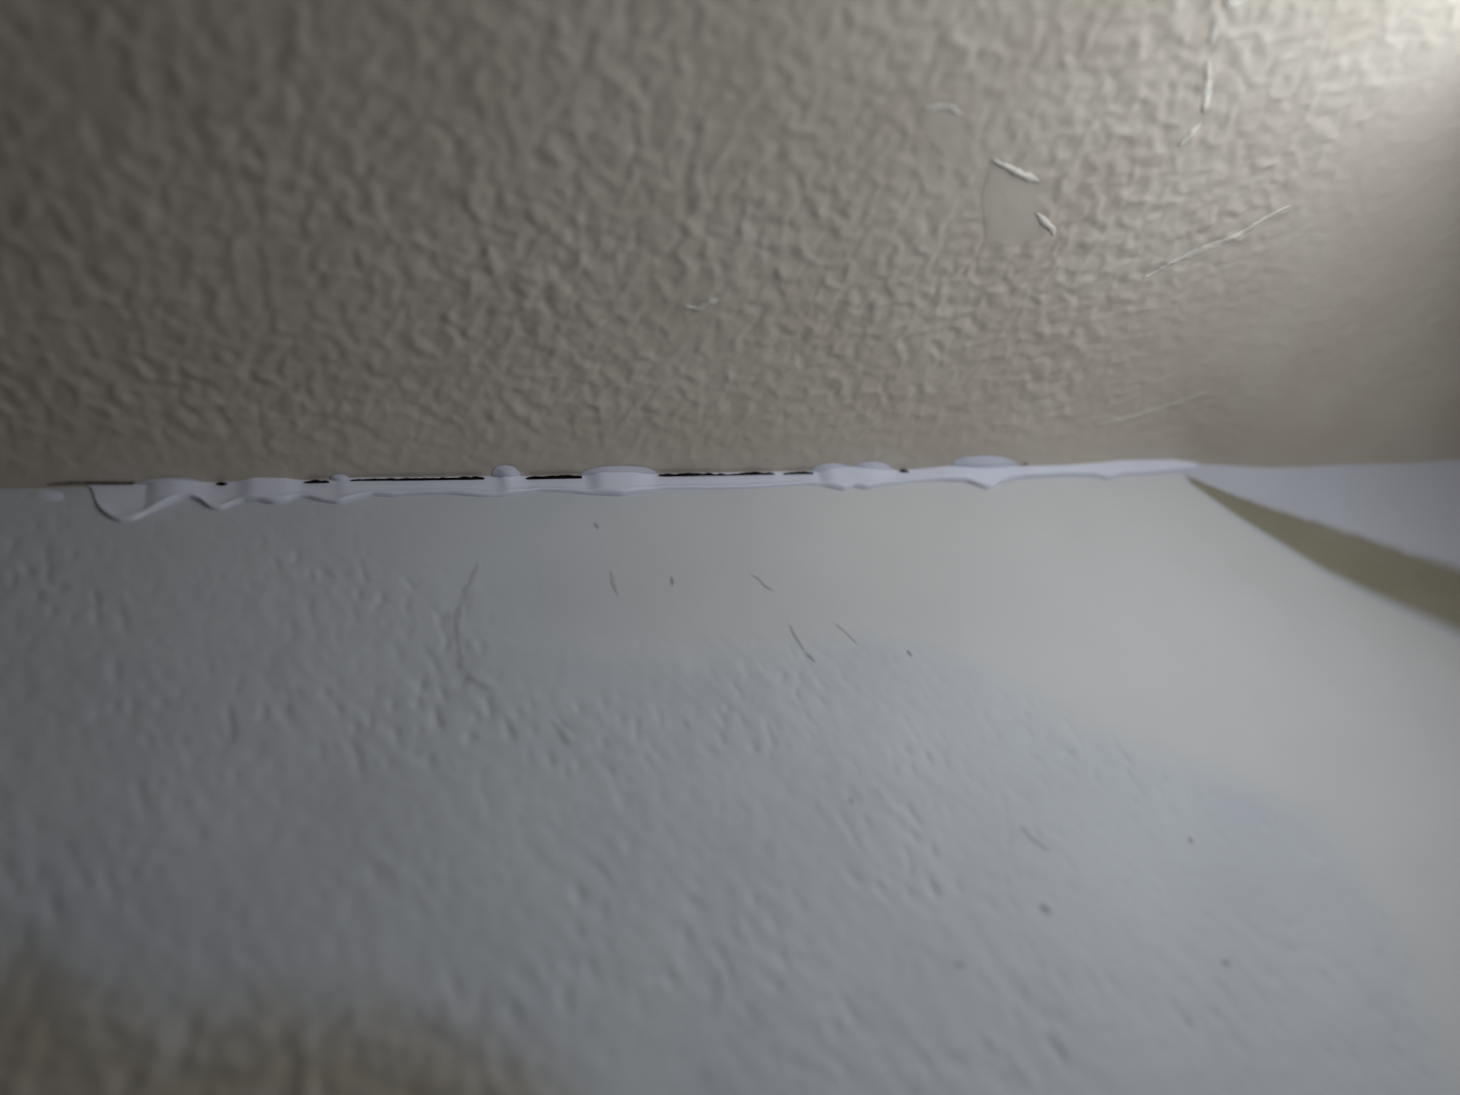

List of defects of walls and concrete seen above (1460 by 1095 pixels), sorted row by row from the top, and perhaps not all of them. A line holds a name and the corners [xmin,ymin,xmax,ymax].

crack [46,479,136,487]
crack [304,476,485,484]
crack [526,473,582,481]
crack [658,470,814,478]